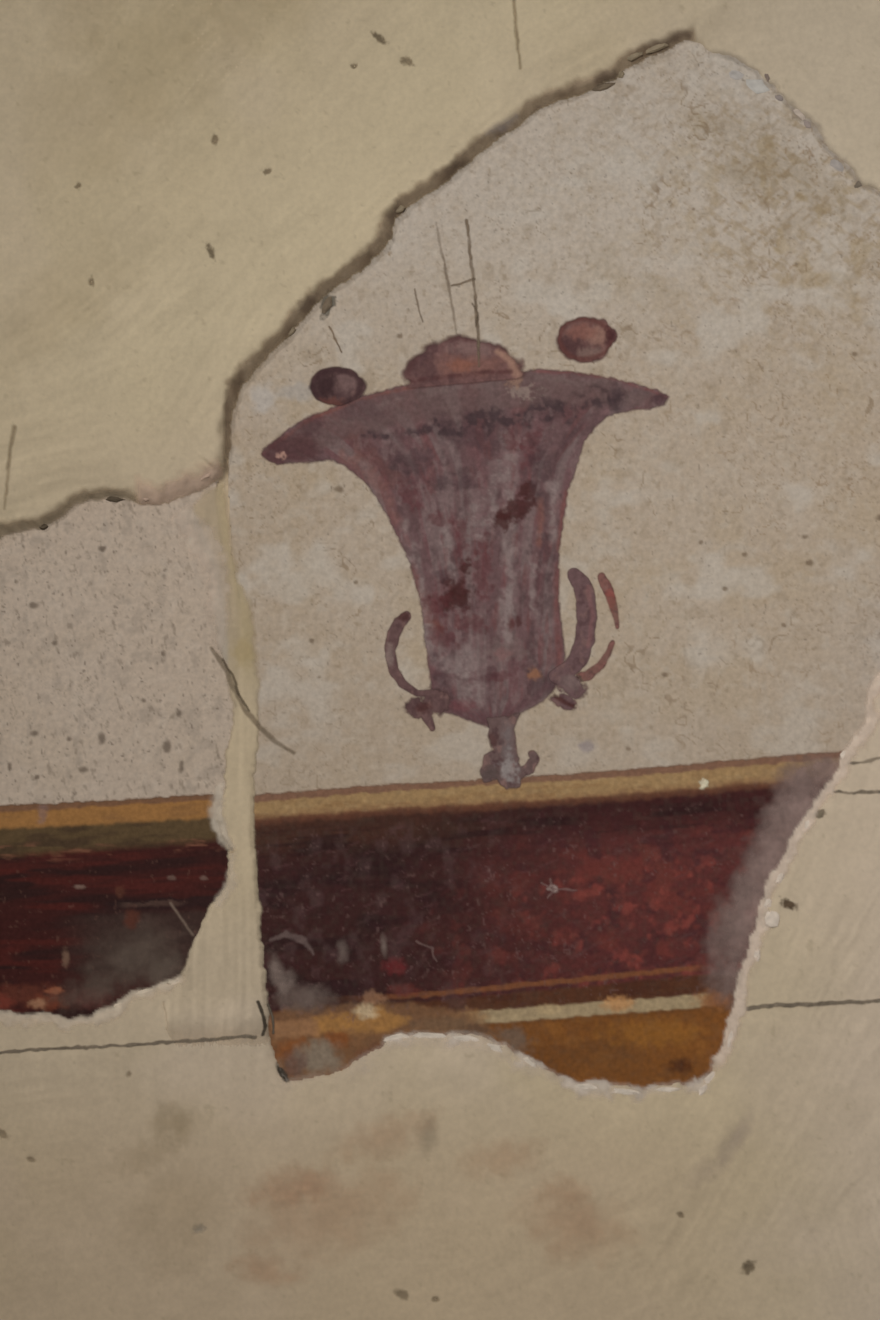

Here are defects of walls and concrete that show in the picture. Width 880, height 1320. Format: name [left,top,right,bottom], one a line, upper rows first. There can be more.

spalling [0,31,694,536]
spalling [0,975,182,1029]
spalling [383,1032,545,1068]
spalling [561,674,880,1099]